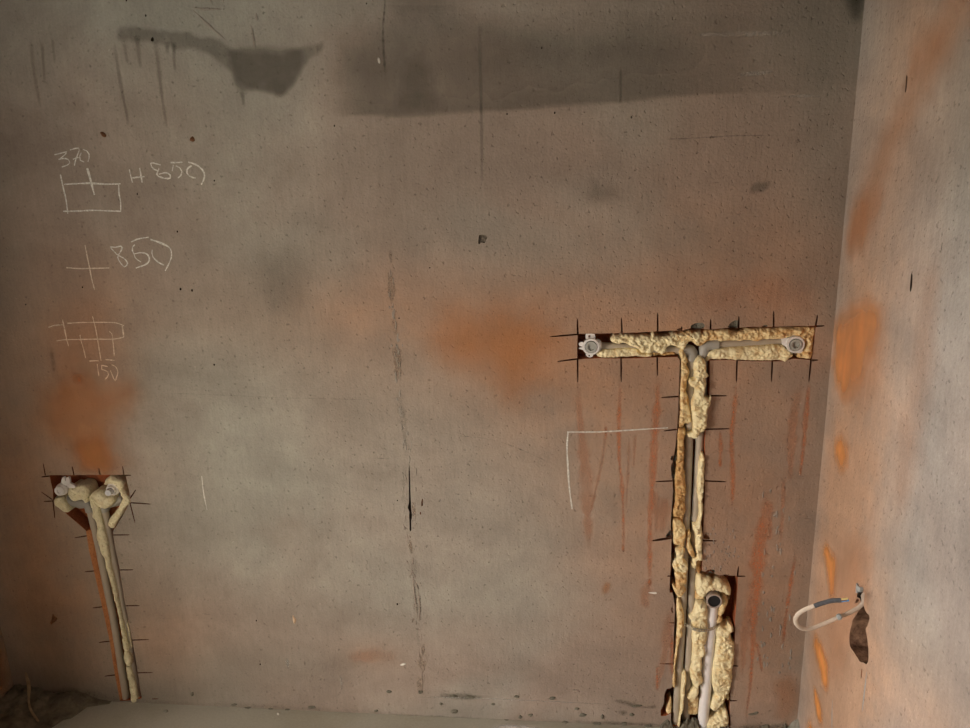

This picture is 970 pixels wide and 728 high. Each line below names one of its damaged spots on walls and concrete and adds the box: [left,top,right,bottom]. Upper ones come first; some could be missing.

crack [388,269,427,691]